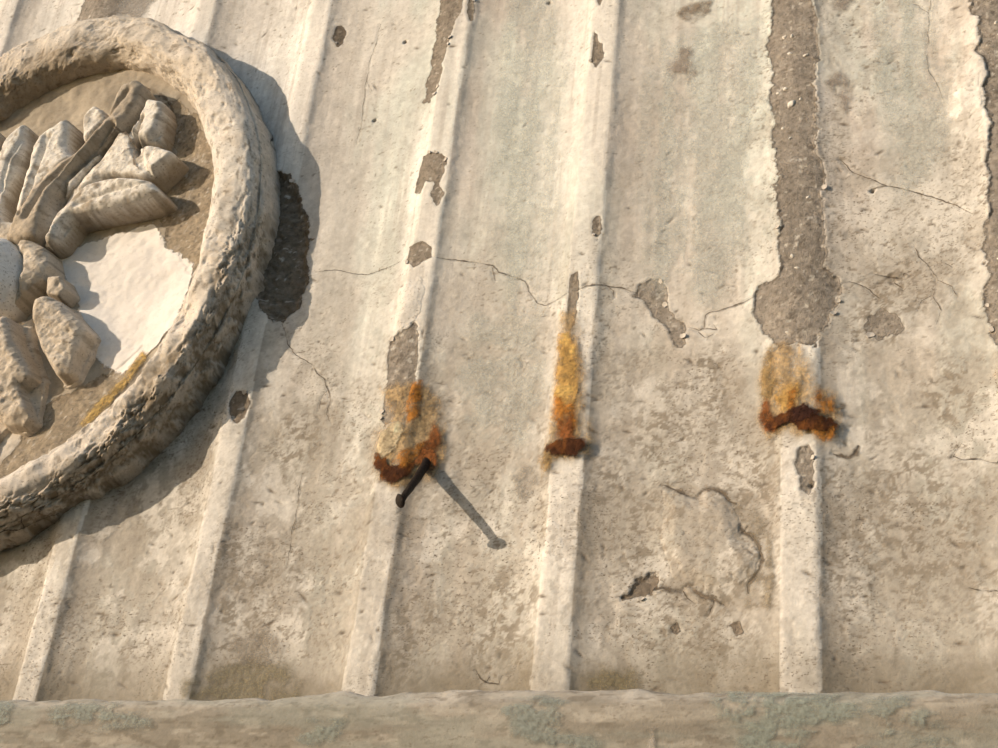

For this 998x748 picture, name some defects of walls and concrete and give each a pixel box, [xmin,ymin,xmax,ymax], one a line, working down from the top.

spalling [422,0,475,104]
spalling [415,150,447,205]
spalling [753,0,842,349]
spalling [968,0,998,345]
spalling [256,171,315,322]
crack [437,257,627,306]
crack [693,297,753,338]
rust [373,380,445,487]
rust [541,312,591,471]
rust [759,343,840,441]
crack [663,485,764,594]
crack [654,586,724,612]